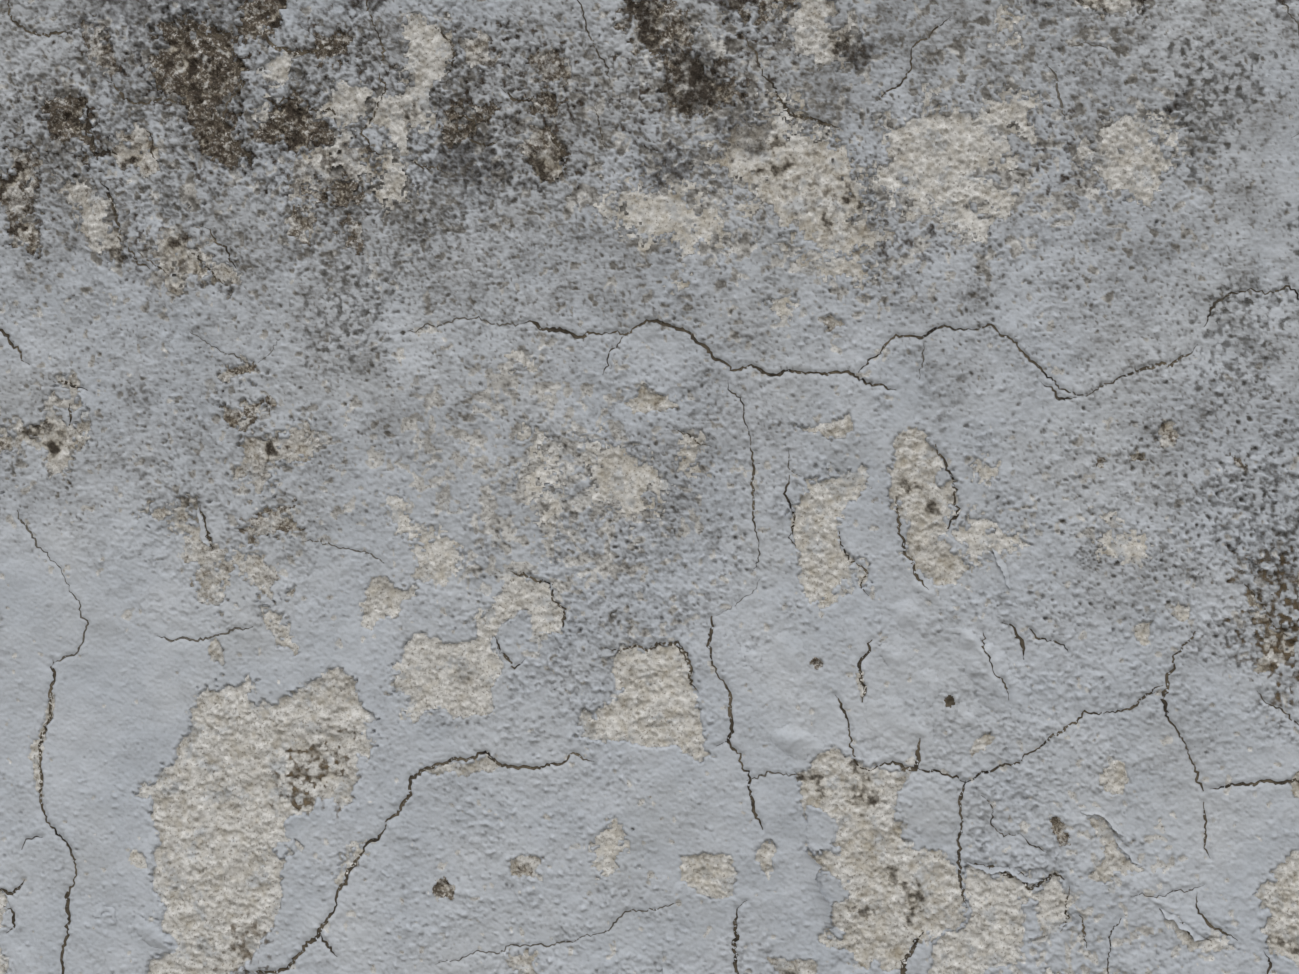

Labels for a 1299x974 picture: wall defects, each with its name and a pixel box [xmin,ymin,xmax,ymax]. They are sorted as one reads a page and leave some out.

damp [17,26,290,184]
mould [433,21,594,199]
mould [592,0,796,195]
damp [1164,36,1263,183]
crack [17,510,89,974]
peeling [128,637,376,974]
crack [254,750,594,974]
peeling [387,570,566,724]
peeling [575,640,716,764]
crack [393,285,1299,830]
peeling [767,746,1144,974]
crack [835,631,1299,974]